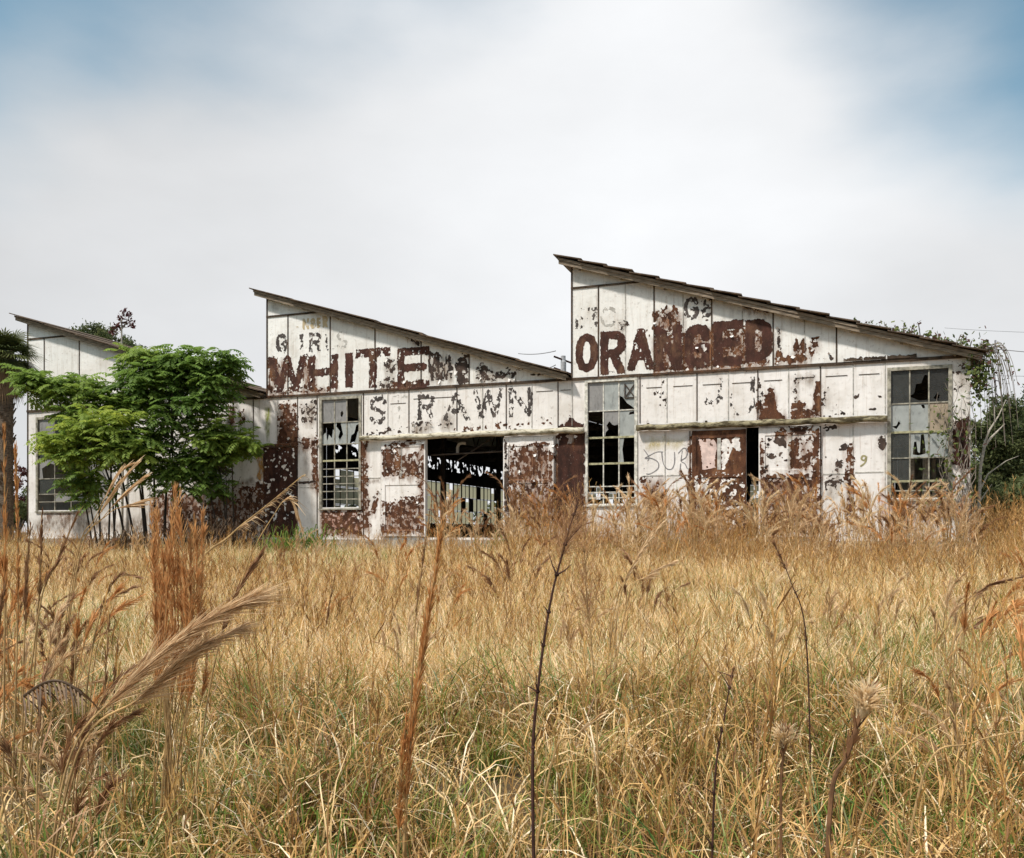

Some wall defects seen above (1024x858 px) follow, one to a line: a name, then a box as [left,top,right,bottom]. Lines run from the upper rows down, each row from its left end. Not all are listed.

peeling [252,384,339,527]
peeling [360,413,556,535]
corrosion [507,415,586,528]
peeling [694,437,745,529]
peeling [760,434,788,475]
peeling [820,387,845,431]
peeling [823,443,849,503]